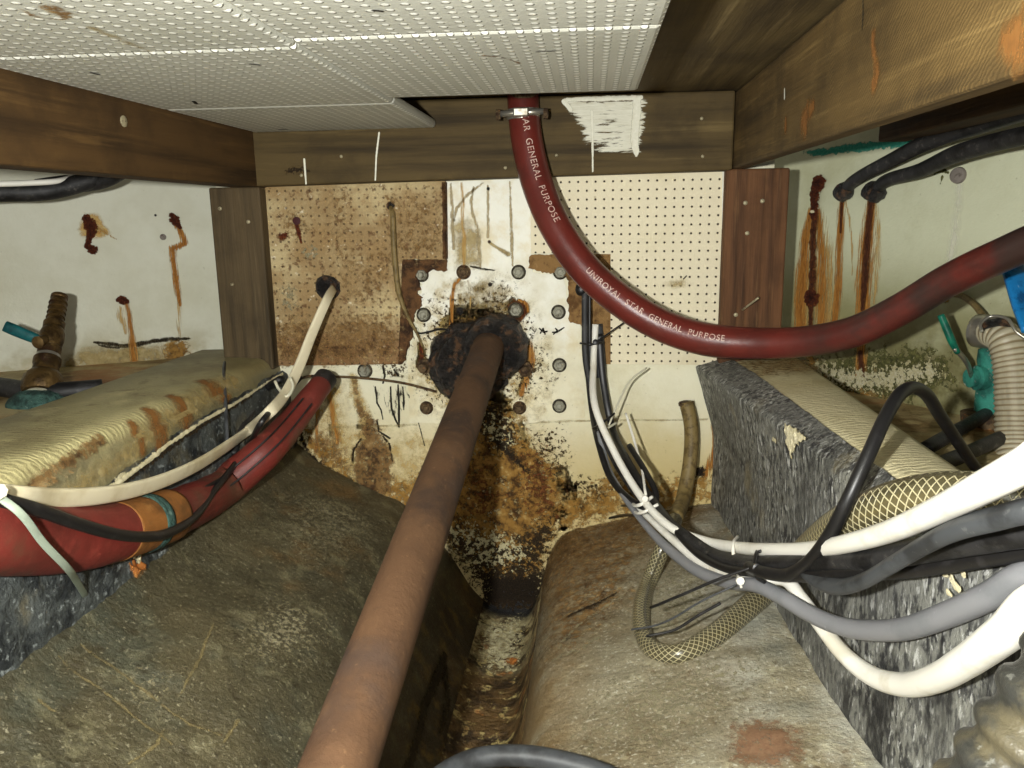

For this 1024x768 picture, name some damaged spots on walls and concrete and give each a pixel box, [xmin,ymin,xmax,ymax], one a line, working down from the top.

corrosion [80,214,115,254]
corrosion [169,213,188,337]
corrosion [794,175,881,327]
corrosion [116,295,138,362]
corrosion [855,344,867,384]
water stain [806,340,963,399]
corrosion [350,374,395,495]
peeling [772,423,806,459]
water stain [447,400,636,582]
water stain [645,471,680,509]
water stain [689,466,712,505]